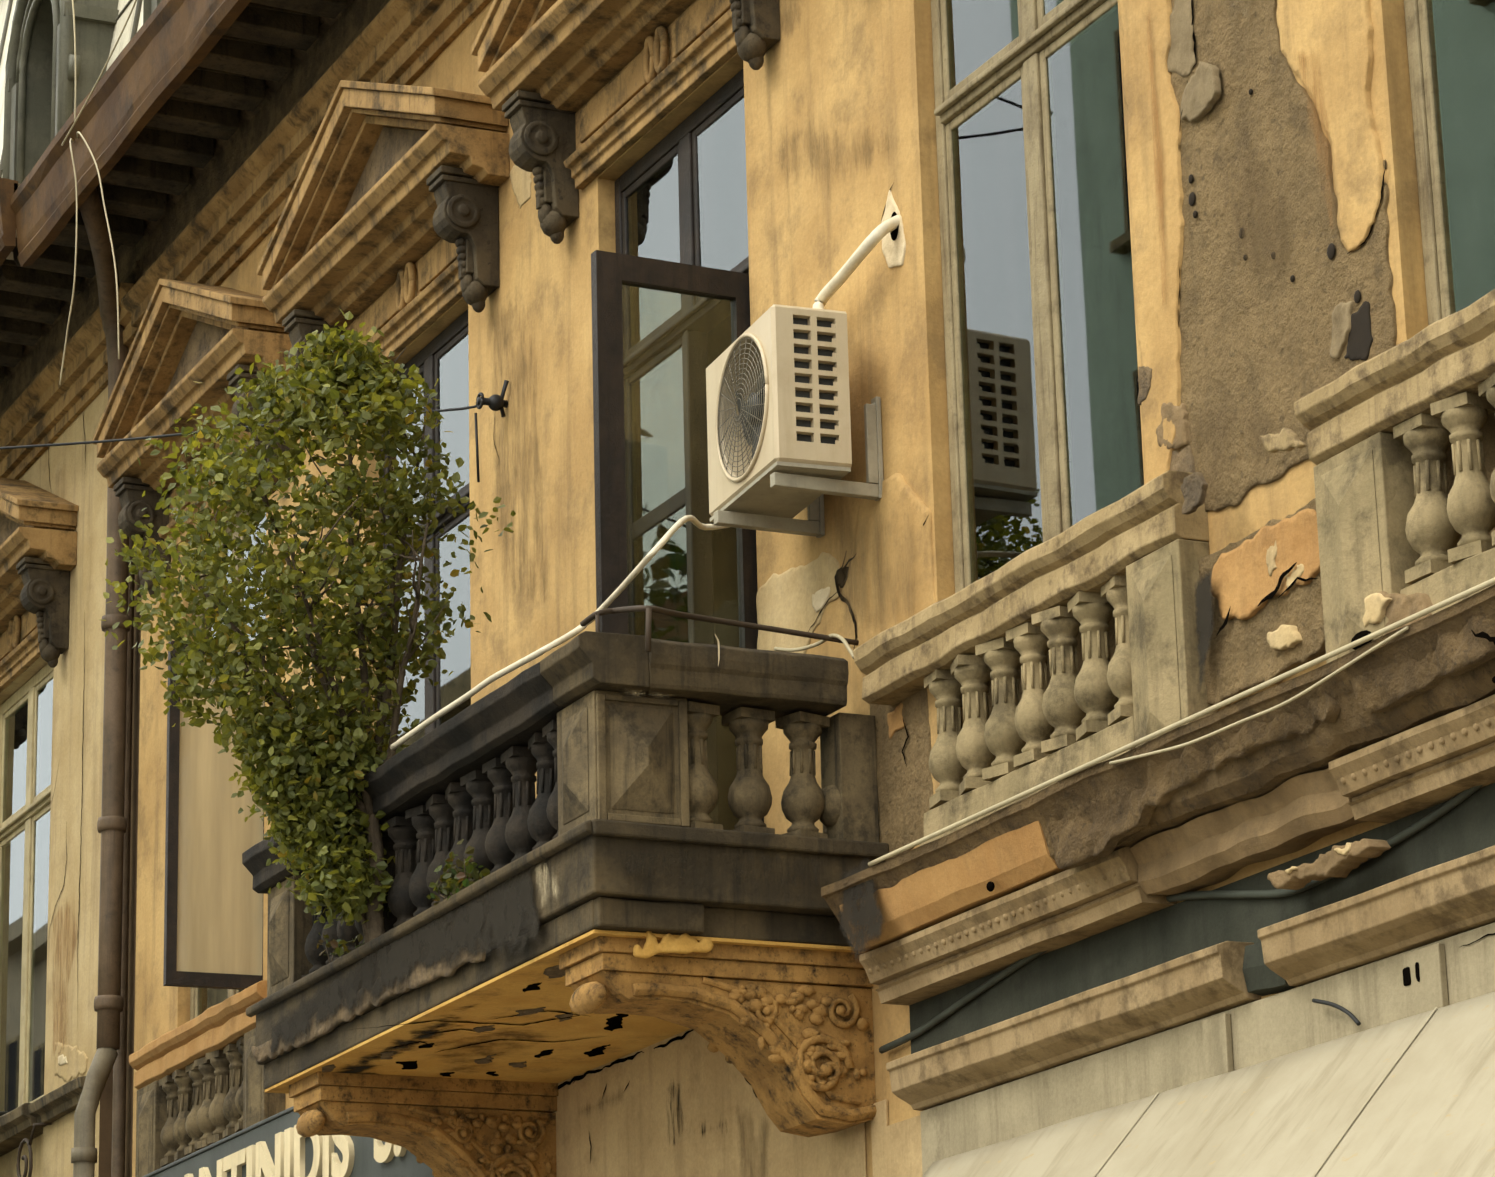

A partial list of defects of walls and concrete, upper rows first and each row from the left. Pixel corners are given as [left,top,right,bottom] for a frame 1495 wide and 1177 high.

flaking render [1119,0,1397,515]
flaking render [756,552,840,654]
crack [808,551,857,650]
flaking render [1198,498,1326,707]
peeling [633,931,714,959]
spalling [251,946,629,1076]